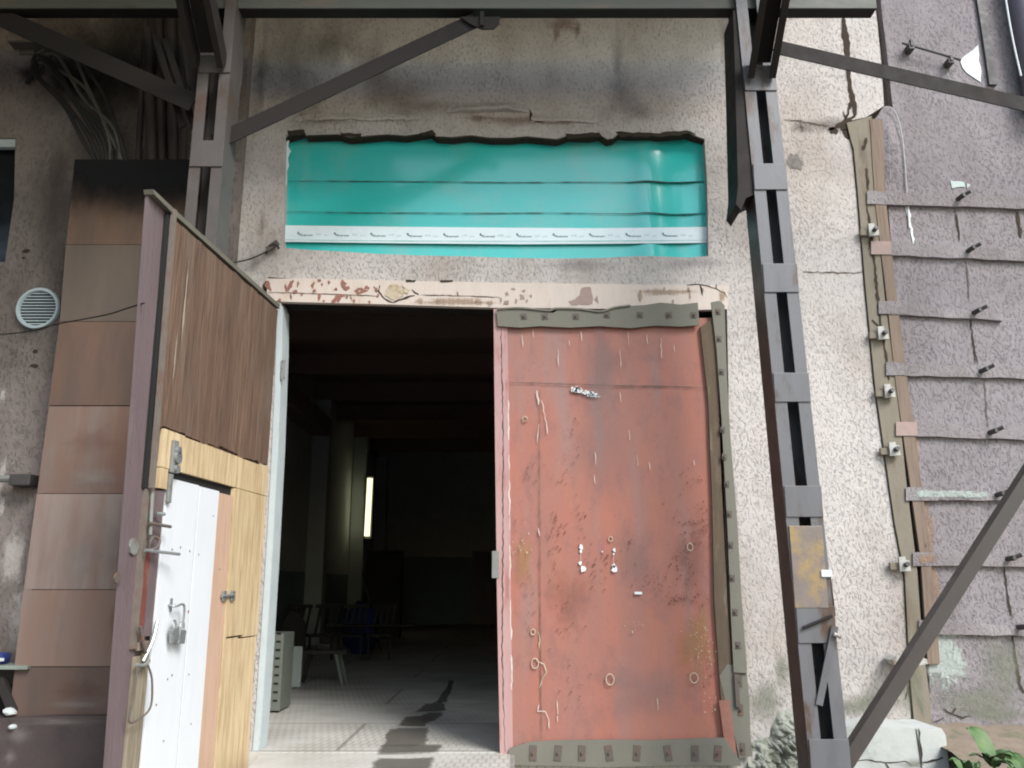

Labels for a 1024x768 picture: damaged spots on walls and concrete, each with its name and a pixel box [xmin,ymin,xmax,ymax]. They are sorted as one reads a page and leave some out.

crack [783,18,890,380]
peeling [264,279,379,303]
peeling [568,287,599,306]
water stain [929,635,969,689]